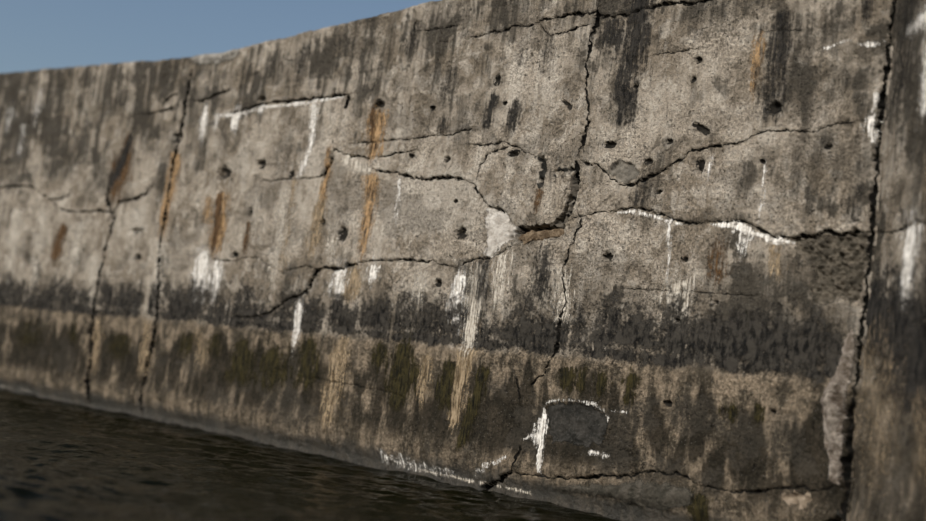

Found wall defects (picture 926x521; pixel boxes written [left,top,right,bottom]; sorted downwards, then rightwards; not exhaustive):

leakage [199,96,344,178]
corrosion [367,105,390,159]
leakage [482,93,523,132]
leakage [864,0,926,143]
crack [0,70,351,416]
corrosion [202,191,231,257]
corrosion [306,145,333,258]
corrosion [343,173,379,304]
leakage [0,174,846,472]
crack [210,0,926,521]
spalling [786,230,870,305]
spalling [547,401,608,447]